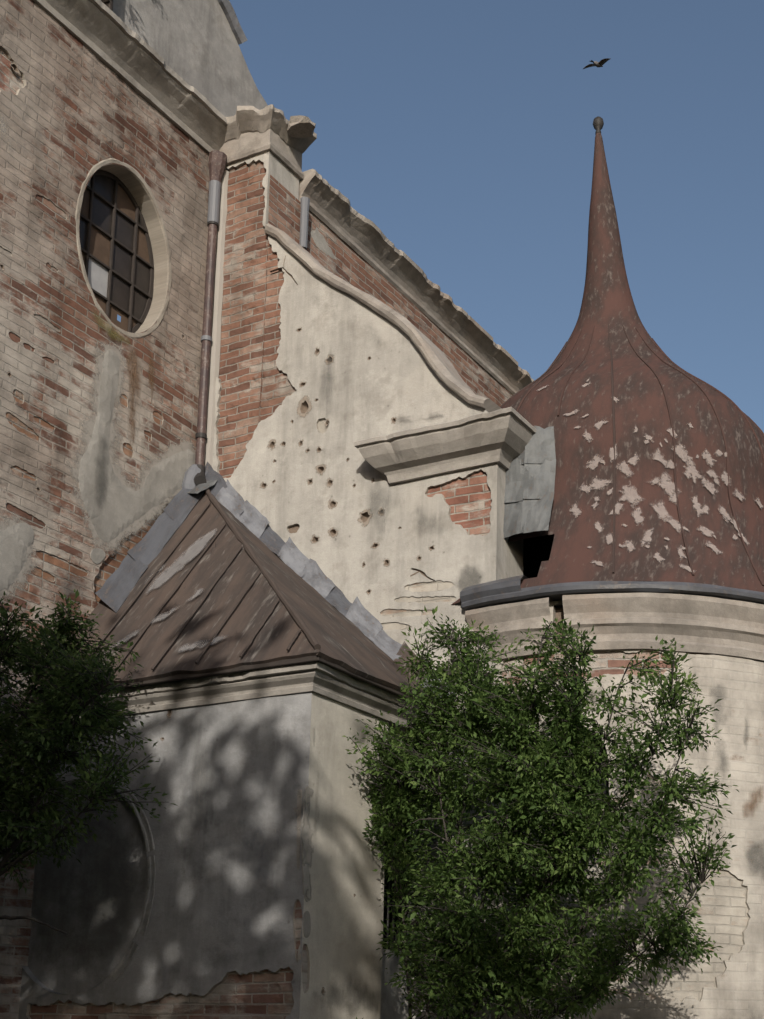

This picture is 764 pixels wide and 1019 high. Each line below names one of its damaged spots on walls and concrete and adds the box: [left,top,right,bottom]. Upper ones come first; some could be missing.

spalling [0,46,26,95]
flaking render [215,160,306,478]
peeling [9,331,55,364]
flaking render [317,418,329,434]
peeling [564,409,608,442]
flaking render [425,469,492,536]
peeling [580,426,764,572]
crack [410,568,435,581]
spalling [26,787,313,1019]